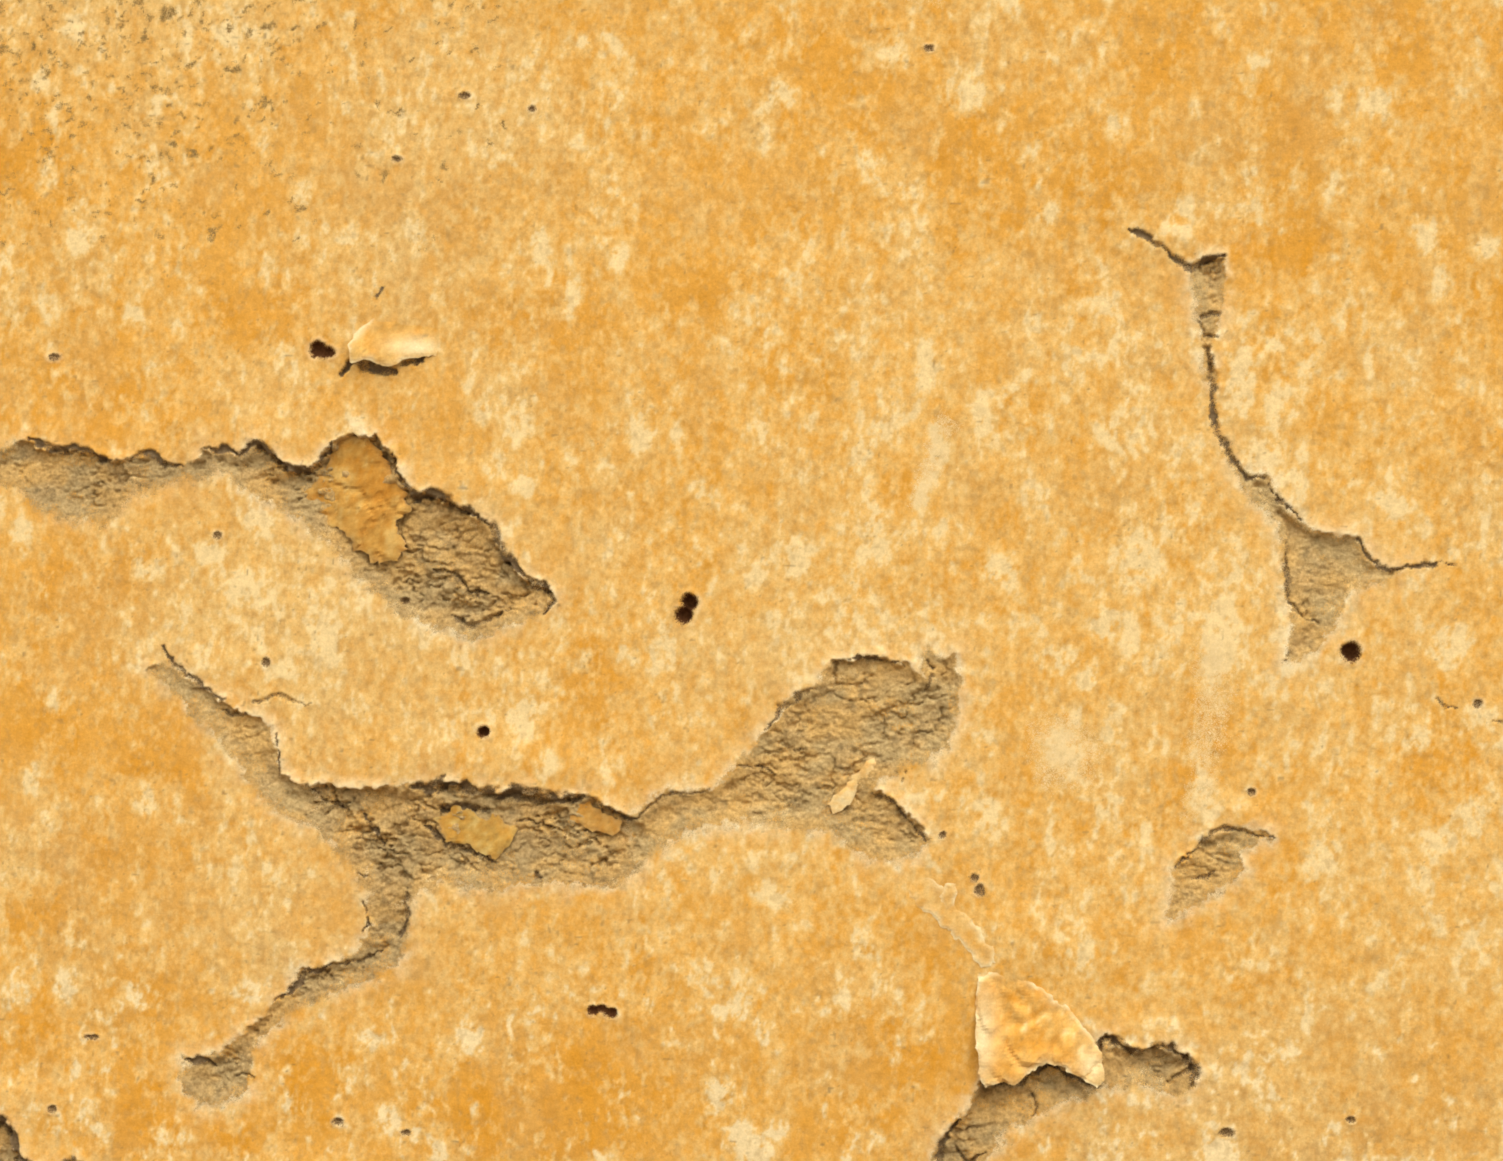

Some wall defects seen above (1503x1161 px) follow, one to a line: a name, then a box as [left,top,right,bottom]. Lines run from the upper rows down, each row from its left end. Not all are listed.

spalling [0,433,557,646]
spalling [144,644,964,1112]
spalling [1163,824,1276,926]
spalling [0,1115,30,1161]
spalling [931,972,1201,1161]